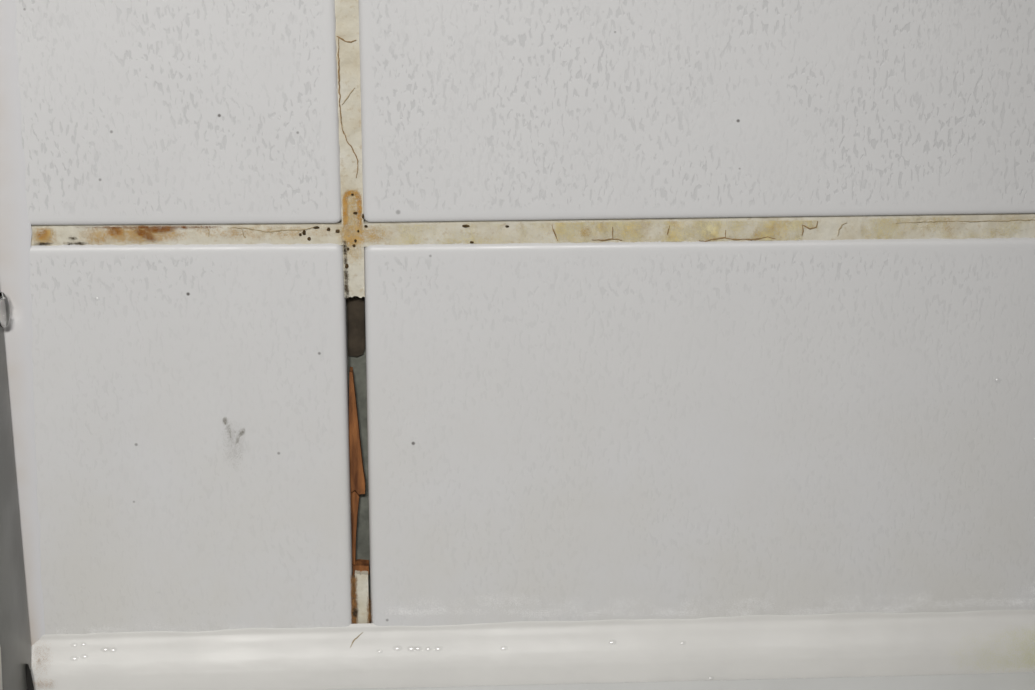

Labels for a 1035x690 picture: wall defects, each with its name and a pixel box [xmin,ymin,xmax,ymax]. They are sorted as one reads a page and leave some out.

crack [337,36,358,178]
rust [31,189,394,265]
leakage [299,212,818,299]
crack [699,230,776,242]
crack [802,221,846,235]
crack [904,217,1033,225]
leakage [350,574,1035,624]